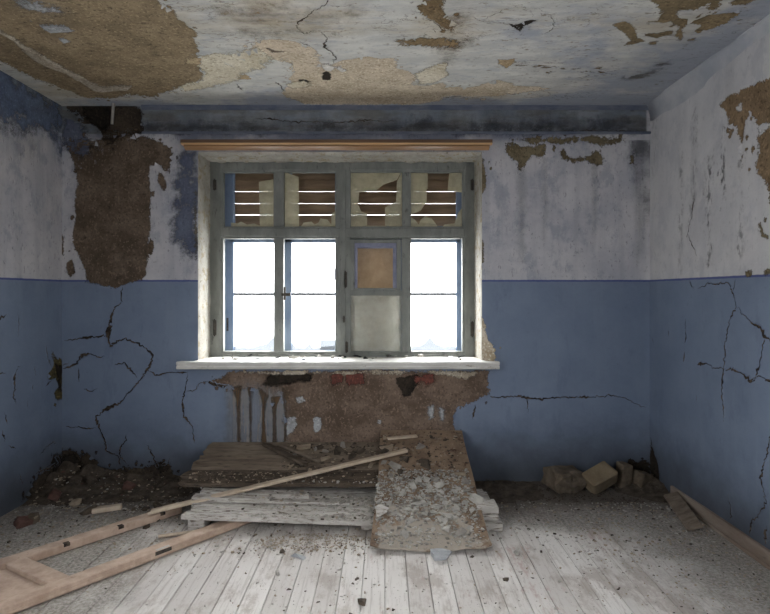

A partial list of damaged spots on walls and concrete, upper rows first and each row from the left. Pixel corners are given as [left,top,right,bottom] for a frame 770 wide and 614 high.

crack [295,0,353,63]
peeling [613,0,754,46]
spalling [0,0,549,288]
peeling [505,128,624,171]
spalling [719,78,770,204]
spalling [48,353,62,407]
crack [46,287,229,468]
spalling [203,318,501,442]
crack [471,393,646,420]
crack [652,279,770,421]
crack [749,436,770,545]